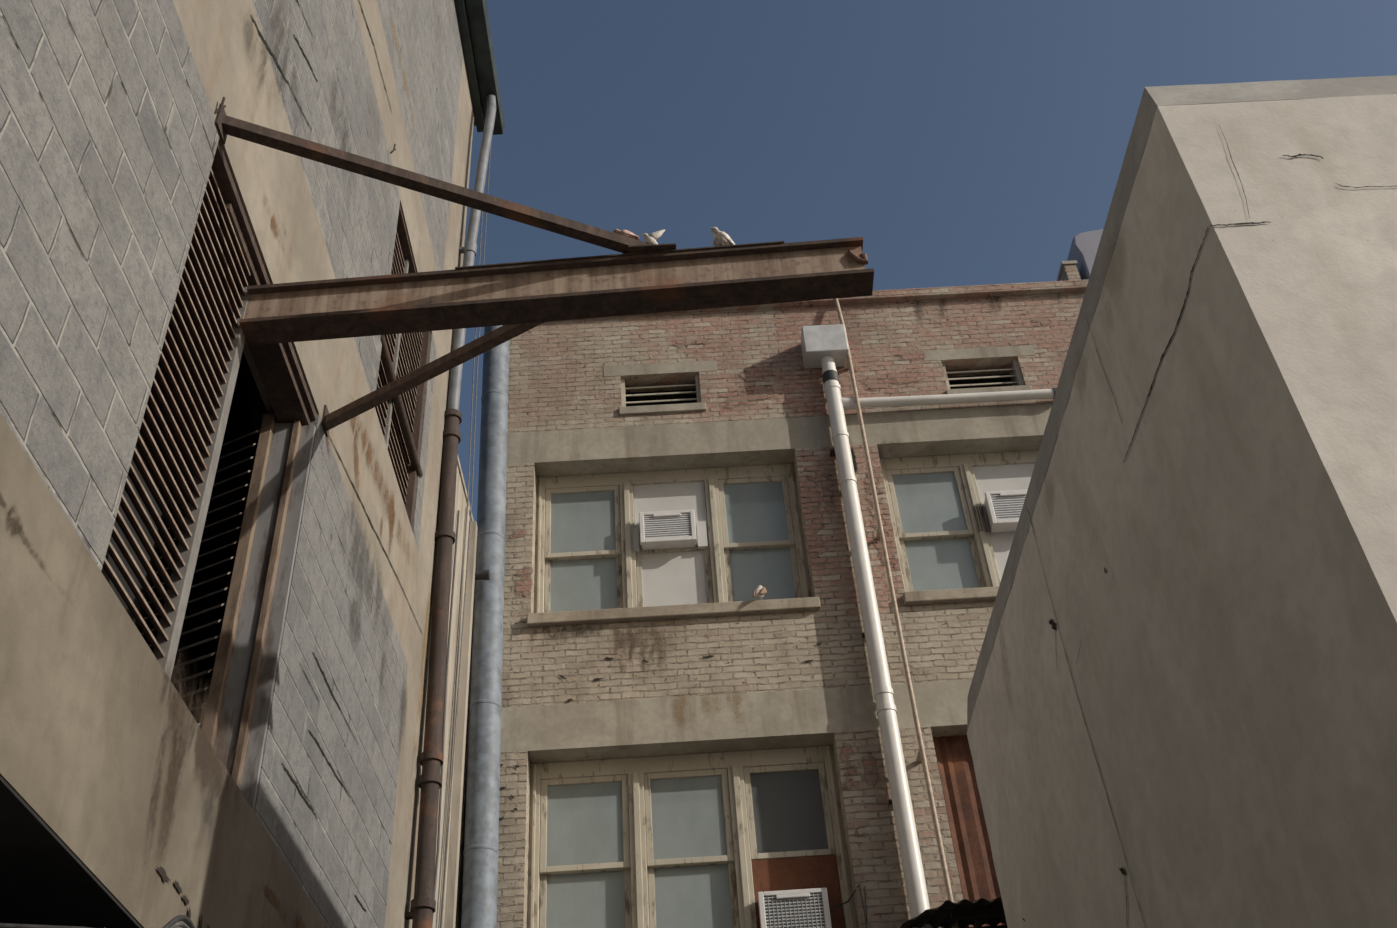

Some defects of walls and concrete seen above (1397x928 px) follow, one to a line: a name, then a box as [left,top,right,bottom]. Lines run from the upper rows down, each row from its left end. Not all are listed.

crack [1086,128,1271,463]
crack [1283,154,1393,188]